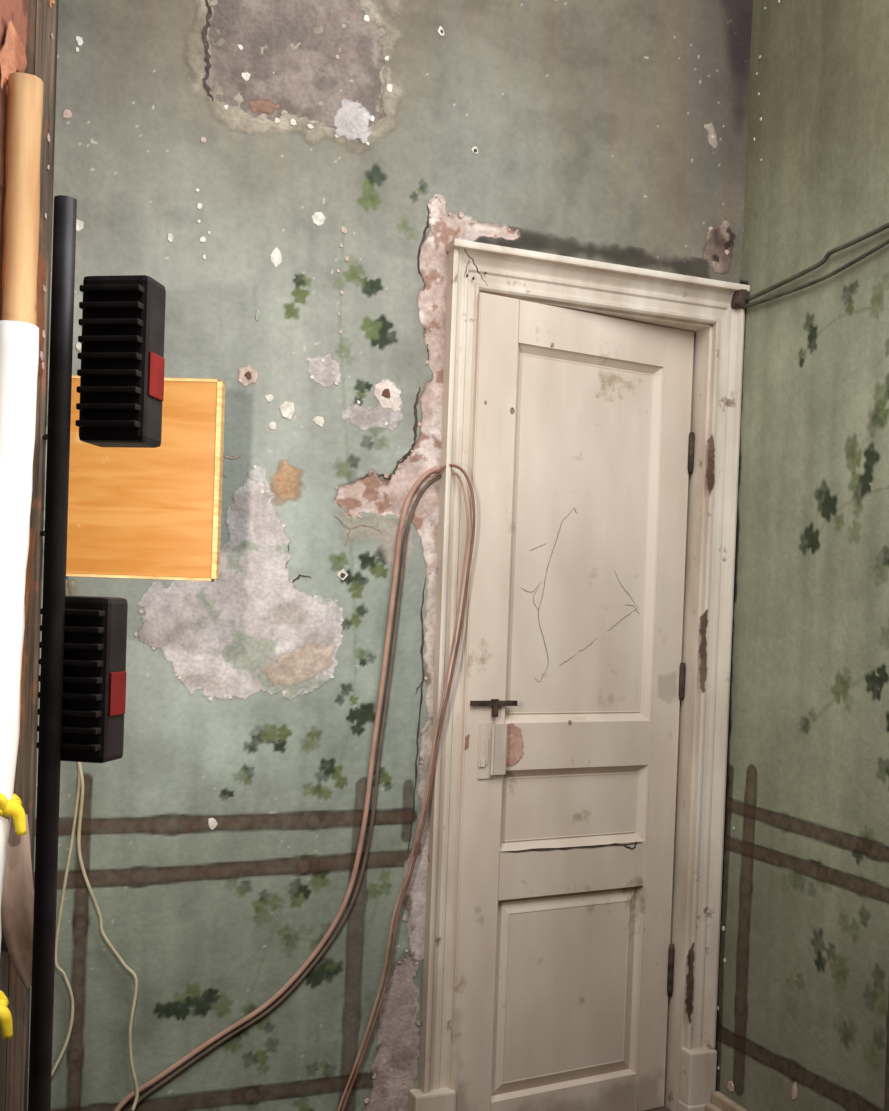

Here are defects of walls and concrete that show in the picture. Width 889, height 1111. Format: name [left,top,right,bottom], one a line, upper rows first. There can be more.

spalling [201,0,393,145]
corrosion [37,253,46,374]
spalling [703,220,735,274]
corrosion [18,529,35,746]
peeling [134,465,344,702]
peeling [334,193,520,1111]